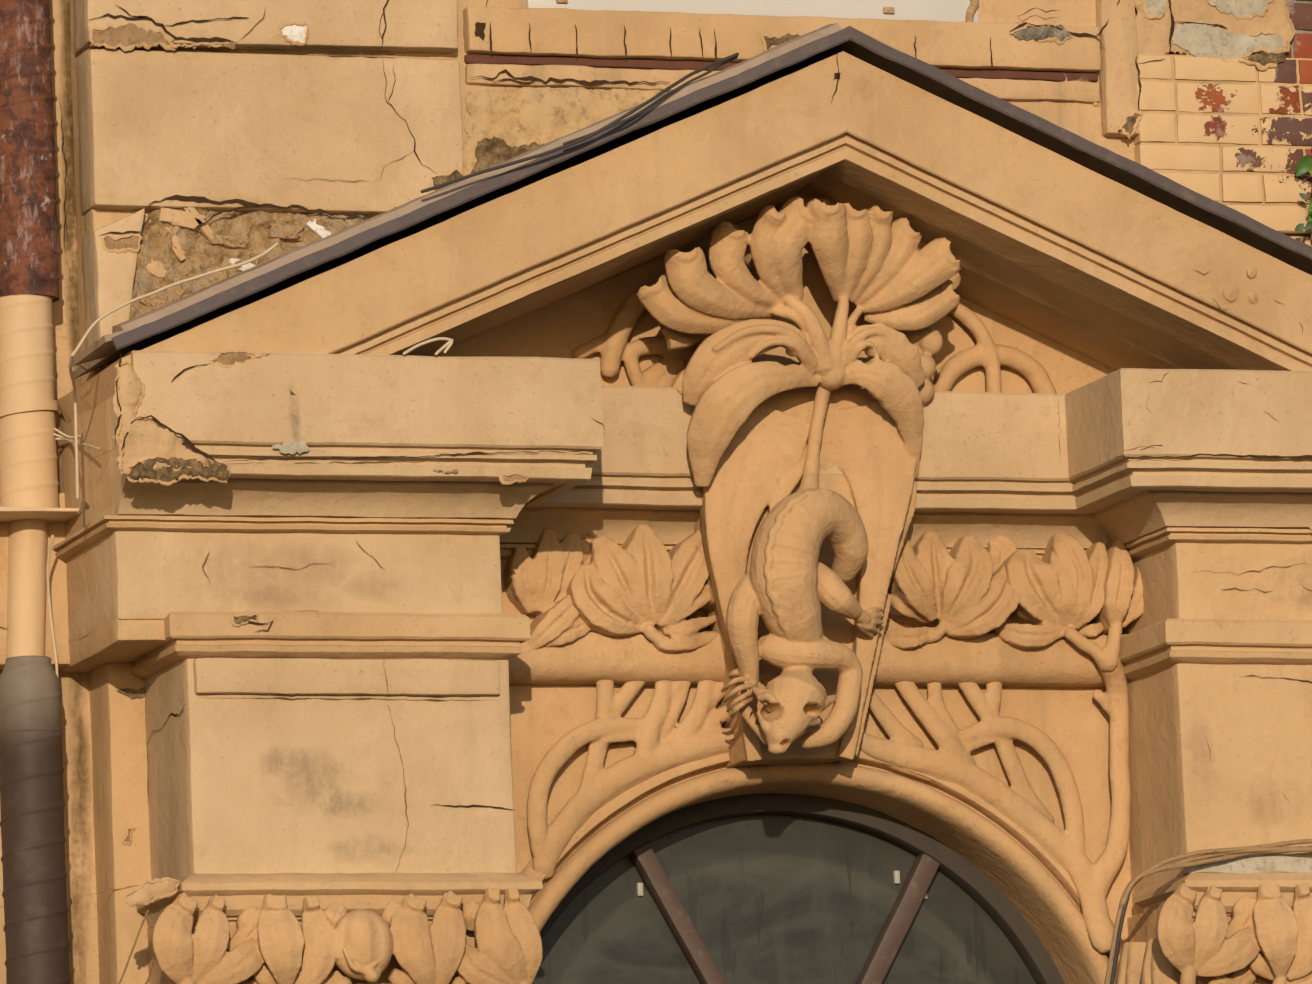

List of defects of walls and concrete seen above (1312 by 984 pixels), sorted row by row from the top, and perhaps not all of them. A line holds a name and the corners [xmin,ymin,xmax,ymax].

flaking render [89,23,236,51]
peeling [280,22,309,46]
peeling [1143,0,1296,70]
crack [296,0,437,182]
corrosion [0,0,60,303]
flaking render [432,69,669,191]
flaking render [101,232,143,254]
spalling [147,195,374,231]
spalling [112,361,231,486]
crack [1247,675,1312,683]
crack [383,658,514,873]